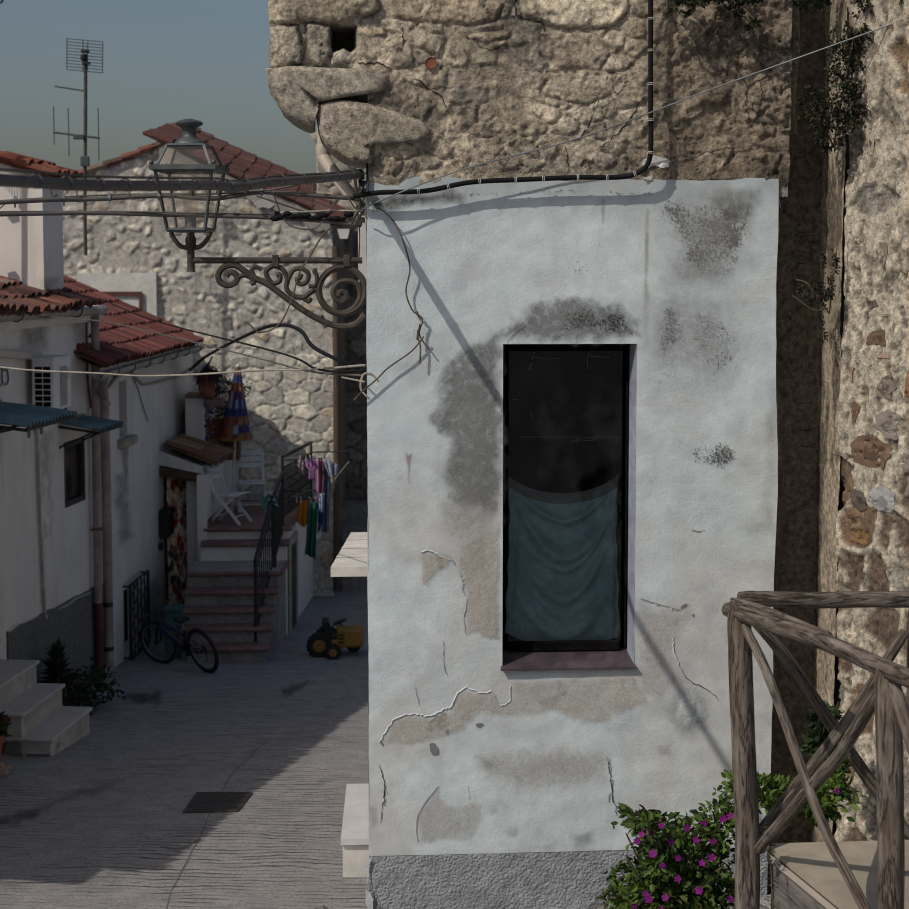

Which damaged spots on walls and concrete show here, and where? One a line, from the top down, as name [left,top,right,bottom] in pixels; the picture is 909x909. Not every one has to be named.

crack [514,0,545,40]
crack [357,27,404,70]
crack [415,79,456,108]
leakage [658,198,751,275]
leakage [438,299,636,508]
leakage [692,441,736,468]
peeling [420,530,498,637]